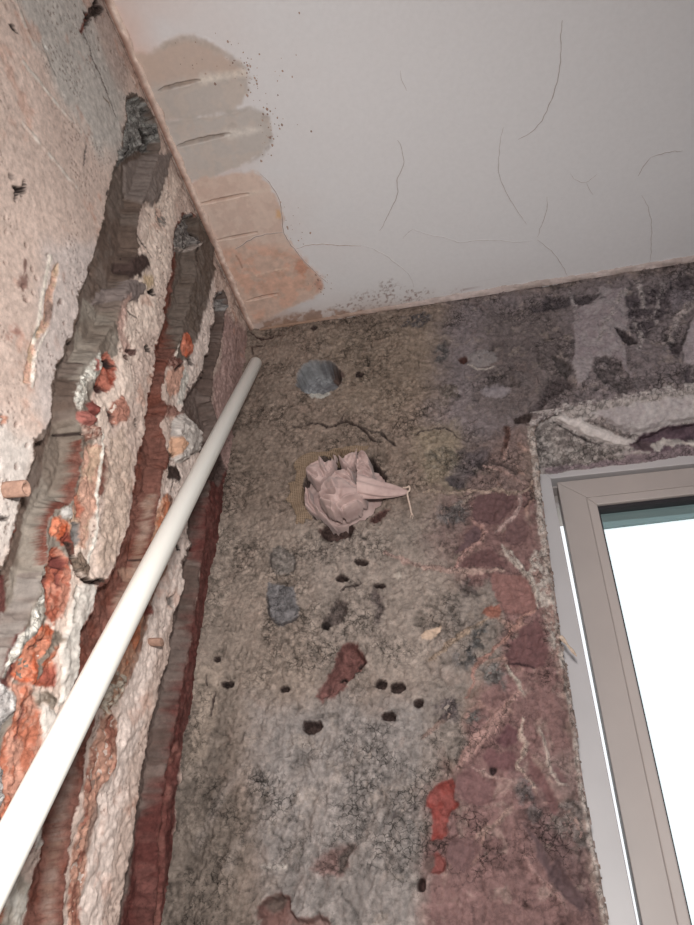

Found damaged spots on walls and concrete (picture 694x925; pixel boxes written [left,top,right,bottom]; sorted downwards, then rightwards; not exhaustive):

spalling [7,170,29,205]
crack [235,173,361,283]
crack [379,140,405,231]
crack [497,20,568,277]
flaking render [164,331,195,407]
spalling [206,452,228,488]
crack [291,409,484,448]
crack [485,459,520,474]
flaking render [0,251,156,820]
flaking render [145,491,171,549]
spalling [414,273,694,925]
flaking render [65,603,155,925]